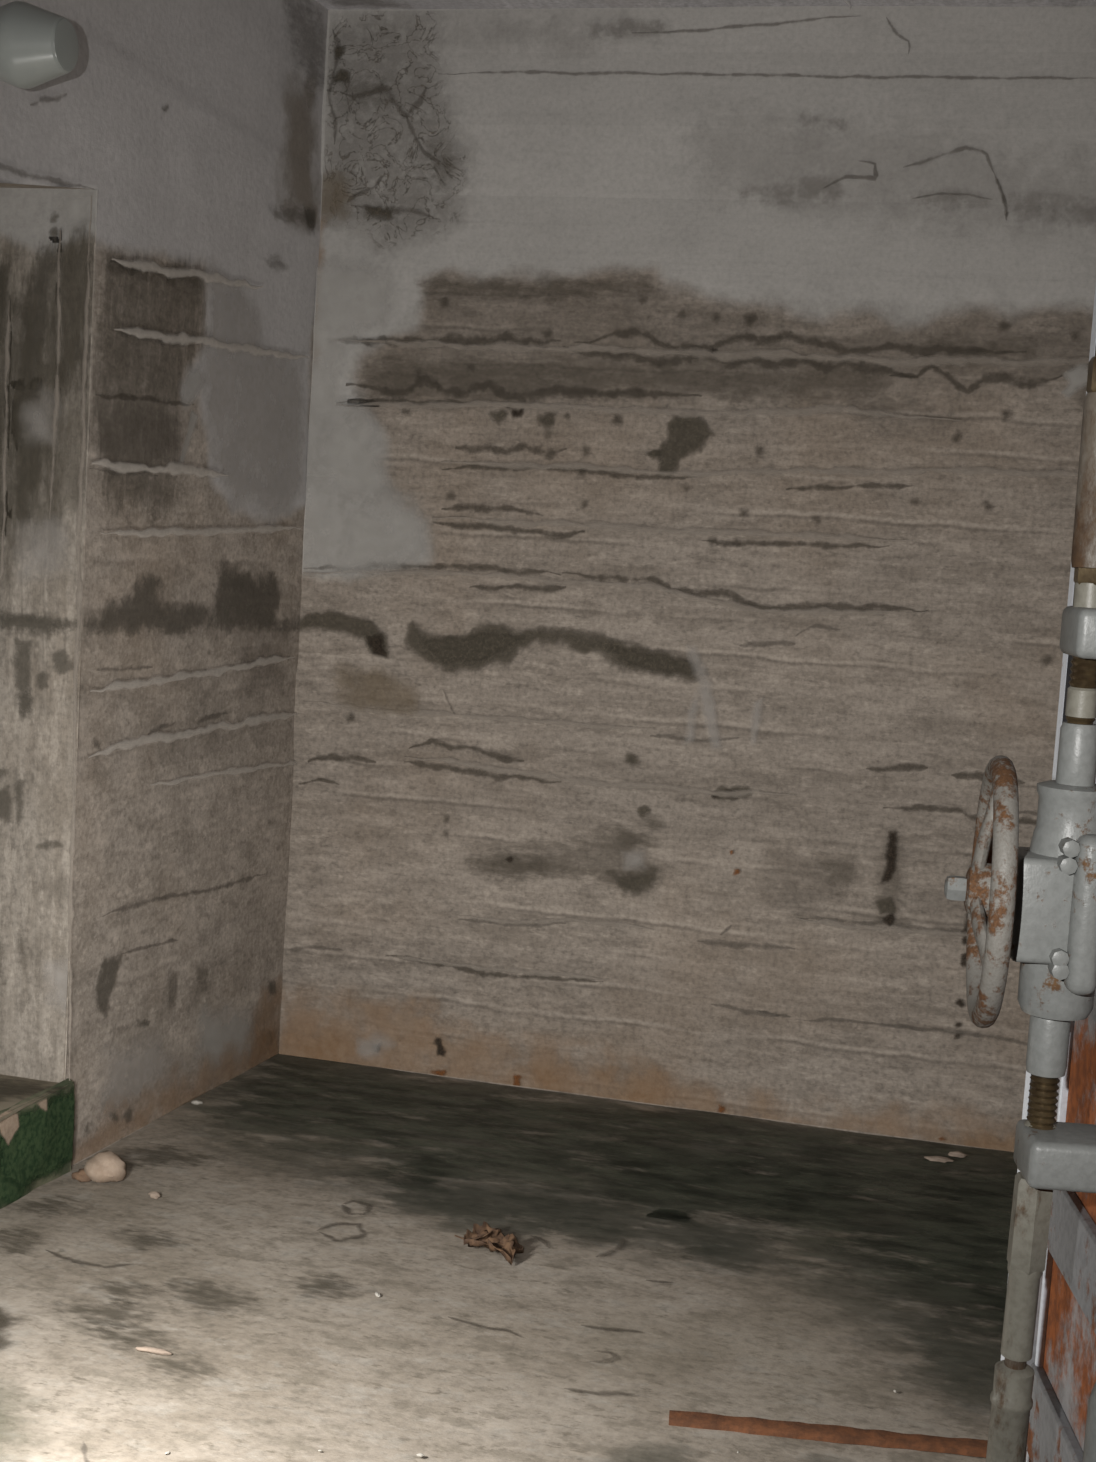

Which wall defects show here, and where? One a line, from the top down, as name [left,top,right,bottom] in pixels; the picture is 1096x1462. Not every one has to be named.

crack [326,14,461,246]
crack [99,394,194,406]
leakage [1064,368,1088,394]
leakage [0,566,387,658]
leakage [406,623,698,680]
leakage [876,832,896,926]
leakage [960,913,968,967]
leakage [221,1053,1017,1329]
leakage [0,1310,13,1348]